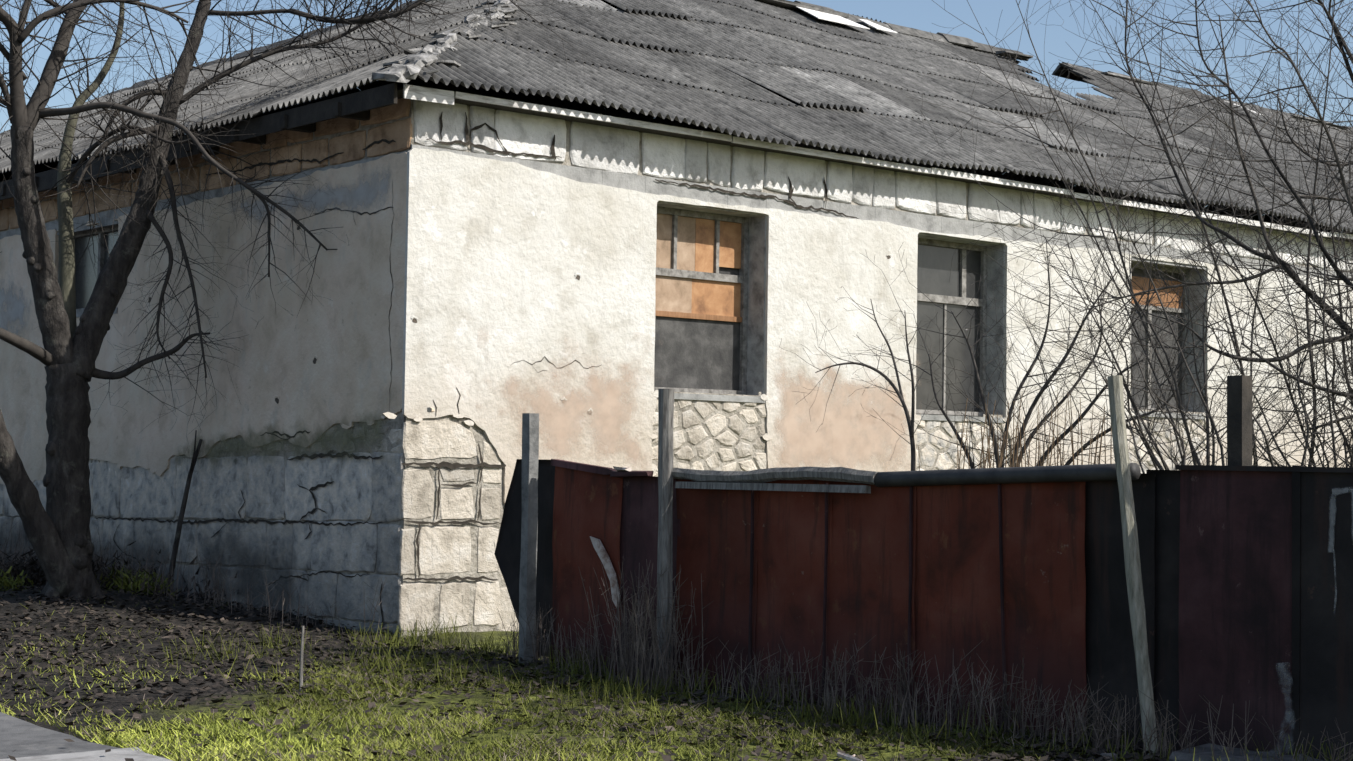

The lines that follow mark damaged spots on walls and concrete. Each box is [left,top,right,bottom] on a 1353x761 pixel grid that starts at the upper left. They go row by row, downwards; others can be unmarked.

crack [206,112,562,182]
crack [655,177,858,219]
crack [511,356,601,373]
damp [509,374,638,459]
peeling [89,407,506,636]
crack [96,430,506,628]